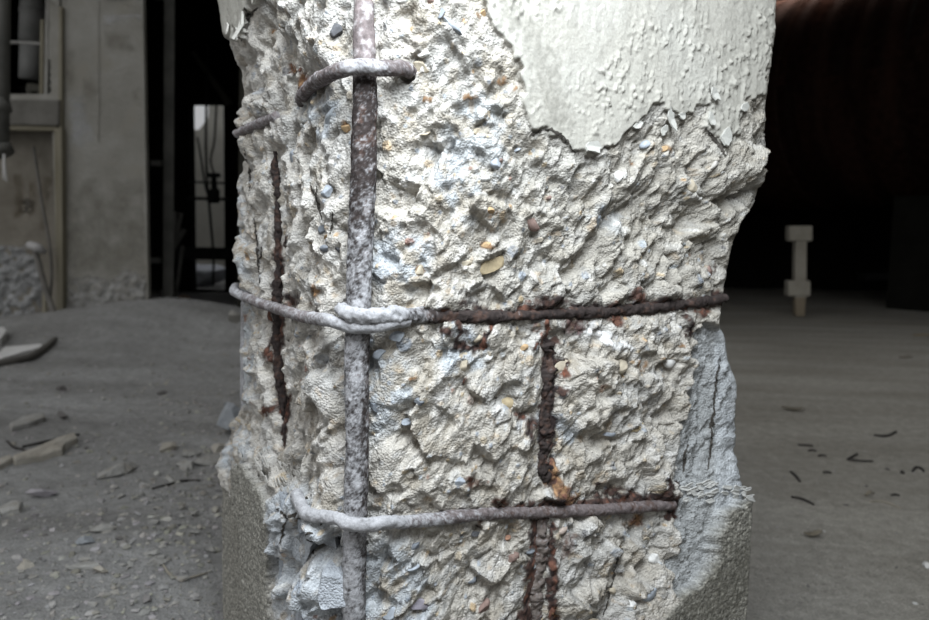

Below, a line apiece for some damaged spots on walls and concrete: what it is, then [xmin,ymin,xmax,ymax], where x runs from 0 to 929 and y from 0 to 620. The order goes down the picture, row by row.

rust [288,63,308,88]
spalling [215,0,355,620]
rust [271,232,300,306]
spalling [365,0,771,620]
rust [261,312,293,447]
rust [440,287,724,521]
crack [682,357,721,473]
rust [517,519,573,620]